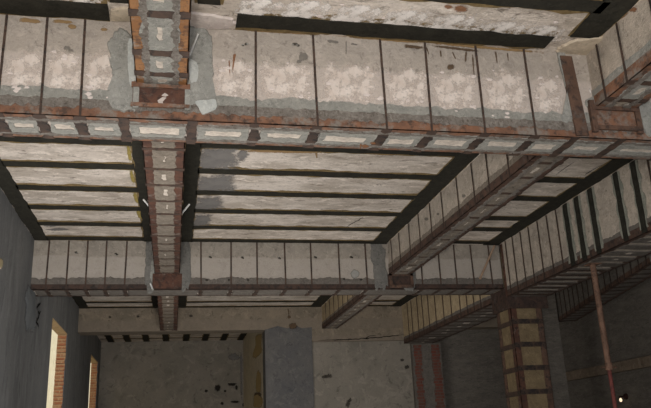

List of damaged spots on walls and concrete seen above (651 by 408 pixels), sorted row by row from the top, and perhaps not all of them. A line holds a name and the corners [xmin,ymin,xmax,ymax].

corrosion [361,38,429,54]
corrosion [436,43,537,72]
water stain [194,148,248,226]